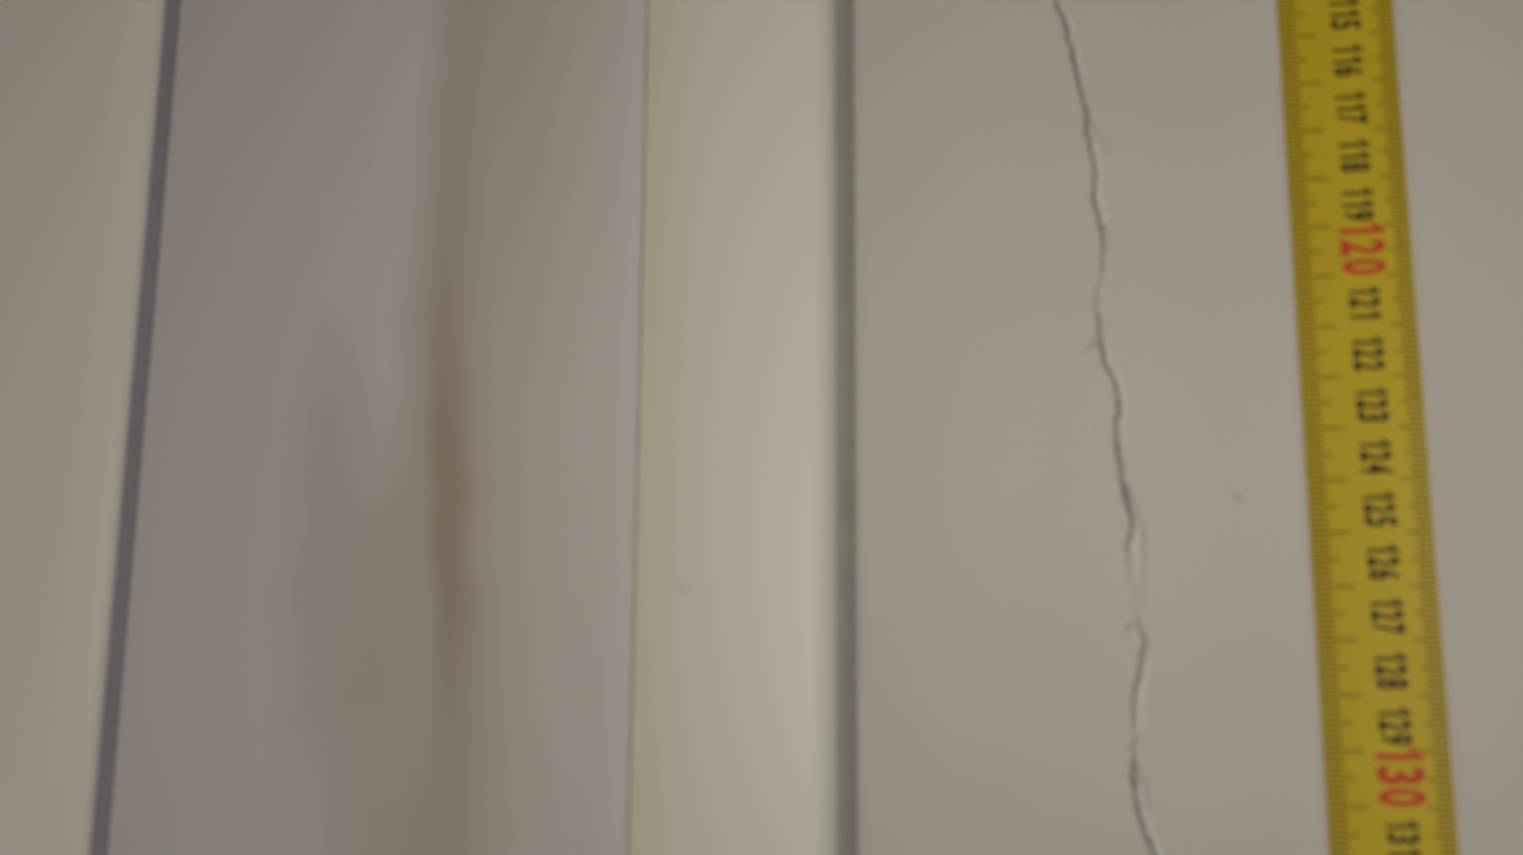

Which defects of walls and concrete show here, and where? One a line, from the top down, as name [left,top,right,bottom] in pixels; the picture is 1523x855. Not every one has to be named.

crack [1062,1,1087,89]
crack [1093,134,1111,248]
crack [1081,324,1143,583]
crack [1139,653,1163,855]